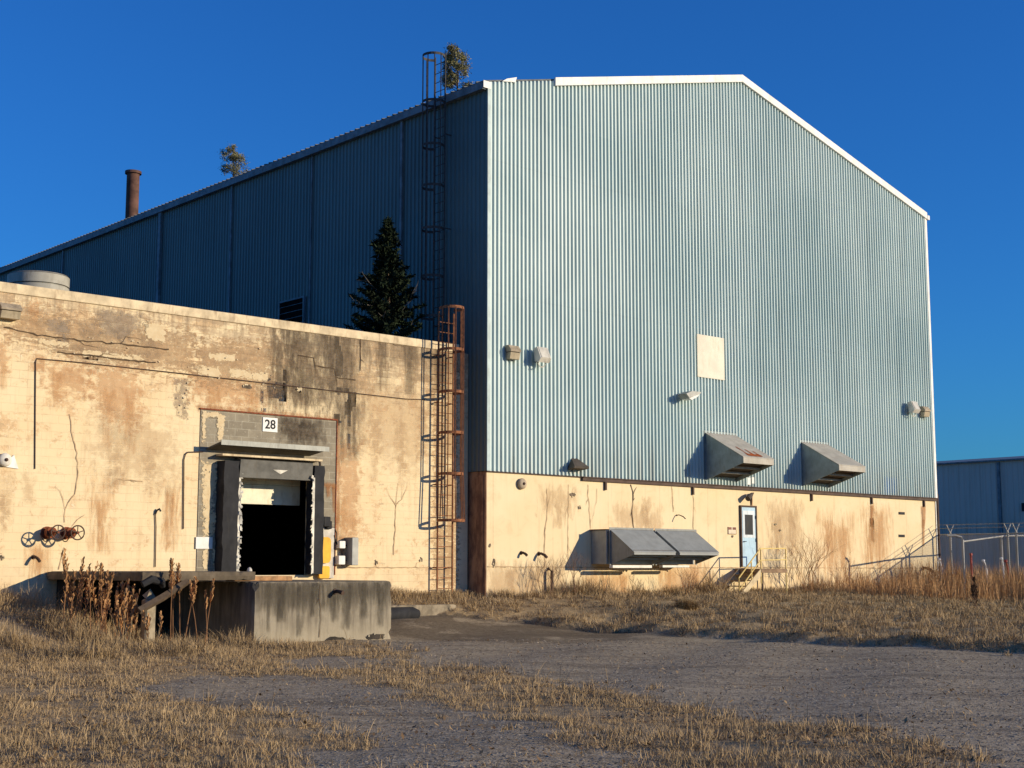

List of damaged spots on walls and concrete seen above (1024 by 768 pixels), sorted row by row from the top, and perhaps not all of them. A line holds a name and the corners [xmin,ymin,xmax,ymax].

crack [4,327,169,363]
leakage [278,329,330,404]
peeling [201,411,226,442]
crack [56,414,81,569]
peeling [200,460,217,571]
crack [319,482,451,637]